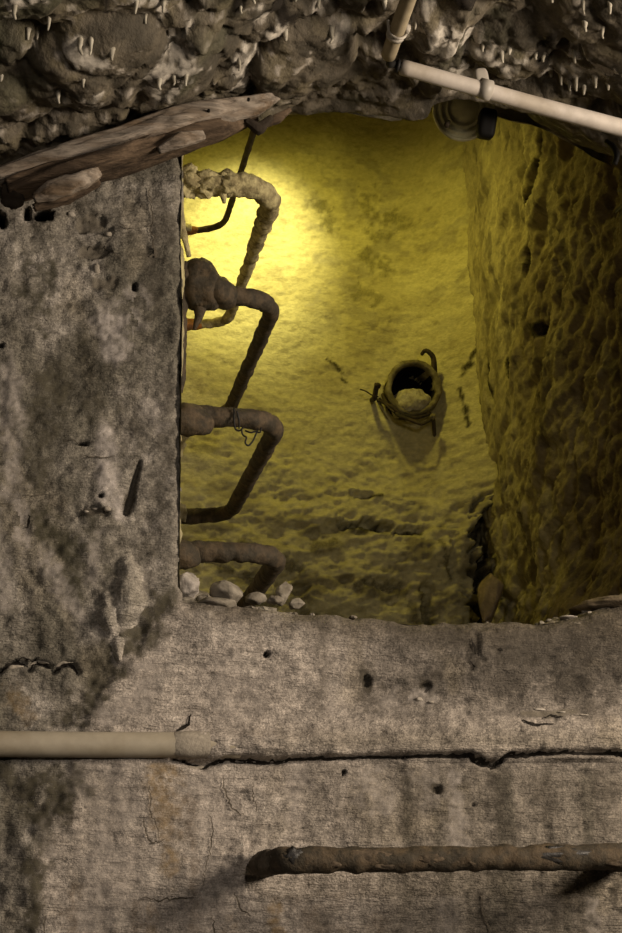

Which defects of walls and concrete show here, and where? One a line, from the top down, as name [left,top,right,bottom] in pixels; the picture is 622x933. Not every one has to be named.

damp [96,309,126,361]
efflorescence [97,428,124,519]
crack [0,657,78,674]
damp [62,590,175,727]
crack [176,714,192,731]
crack [522,714,563,726]
damp [0,763,94,933]
crack [143,748,622,902]